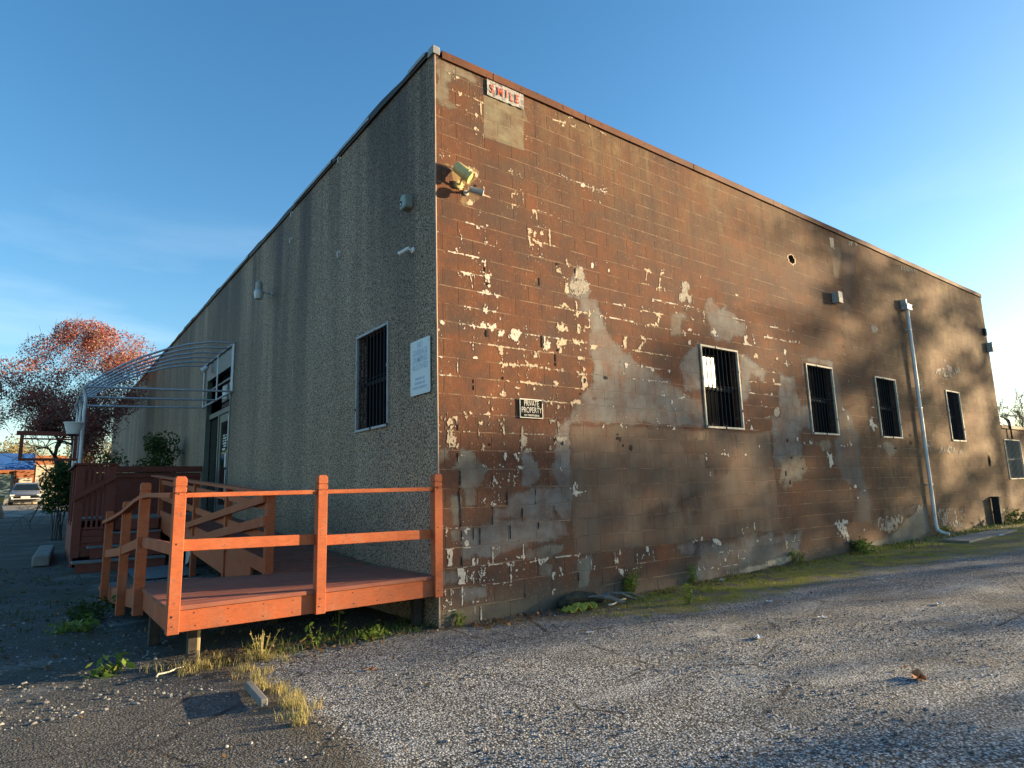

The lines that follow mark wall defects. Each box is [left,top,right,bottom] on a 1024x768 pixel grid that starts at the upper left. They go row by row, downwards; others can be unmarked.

peeling [435,56,532,150]
peeling [439,166,718,506]
peeling [732,317,800,420]
peeling [442,521,595,620]
spalling [765,534,800,566]
spalling [834,519,850,543]
spalling [878,504,923,533]